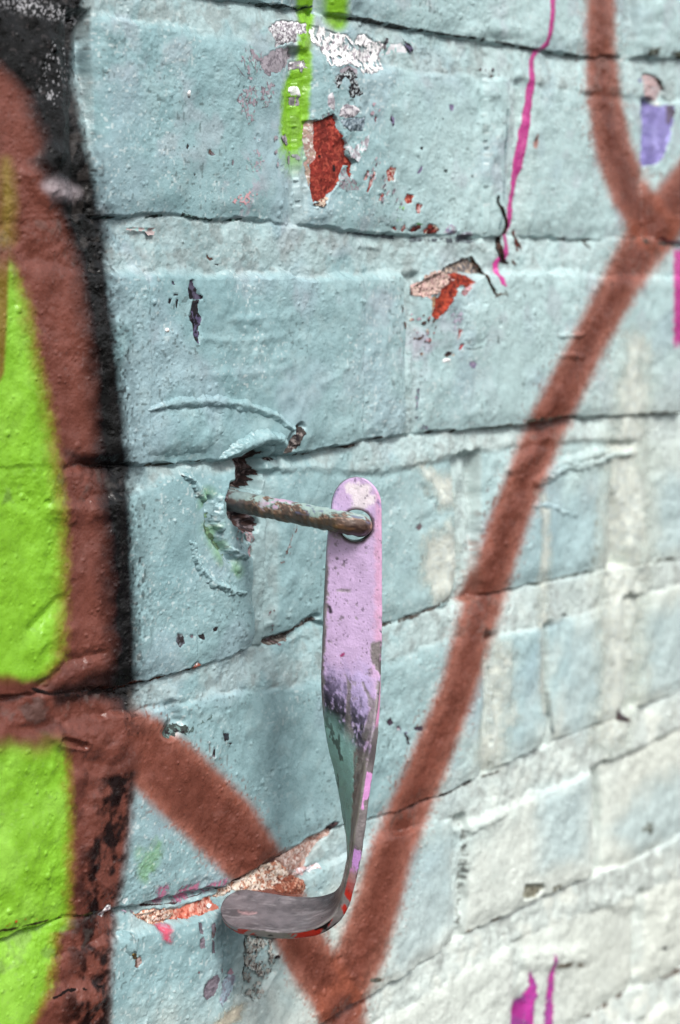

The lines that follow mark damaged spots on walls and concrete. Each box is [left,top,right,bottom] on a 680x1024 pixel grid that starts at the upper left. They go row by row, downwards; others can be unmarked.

spalling [230,20,473,239]
crack [347,108,522,298]
spalling [402,258,478,363]
peeling [98,822,339,953]